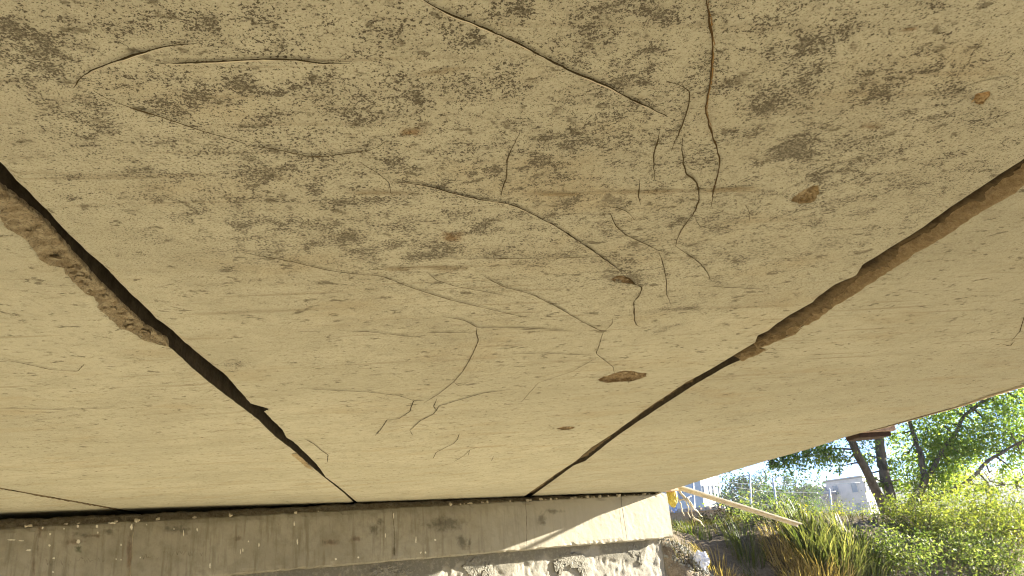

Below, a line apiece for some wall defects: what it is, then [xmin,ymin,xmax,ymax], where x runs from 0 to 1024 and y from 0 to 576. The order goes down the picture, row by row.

spalling [0,183,169,347]
crack [73,0,770,436]
spalling [773,176,839,211]
spalling [589,368,656,385]